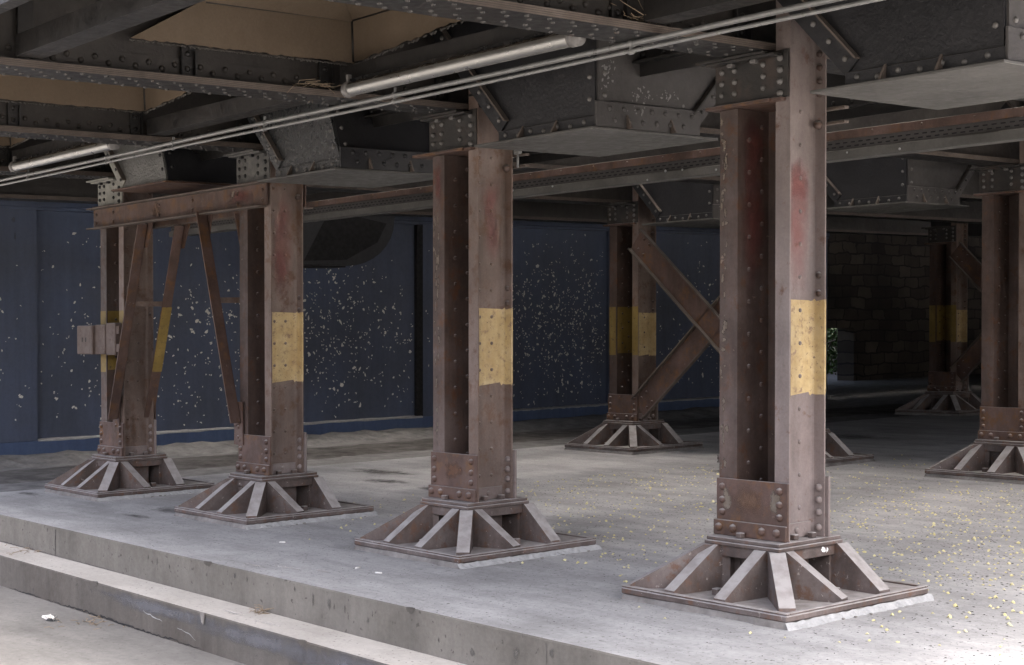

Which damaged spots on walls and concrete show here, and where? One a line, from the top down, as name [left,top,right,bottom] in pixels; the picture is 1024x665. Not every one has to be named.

peeling [153,264,240,426]
peeling [303,265,413,418]
peeling [513,234,605,405]